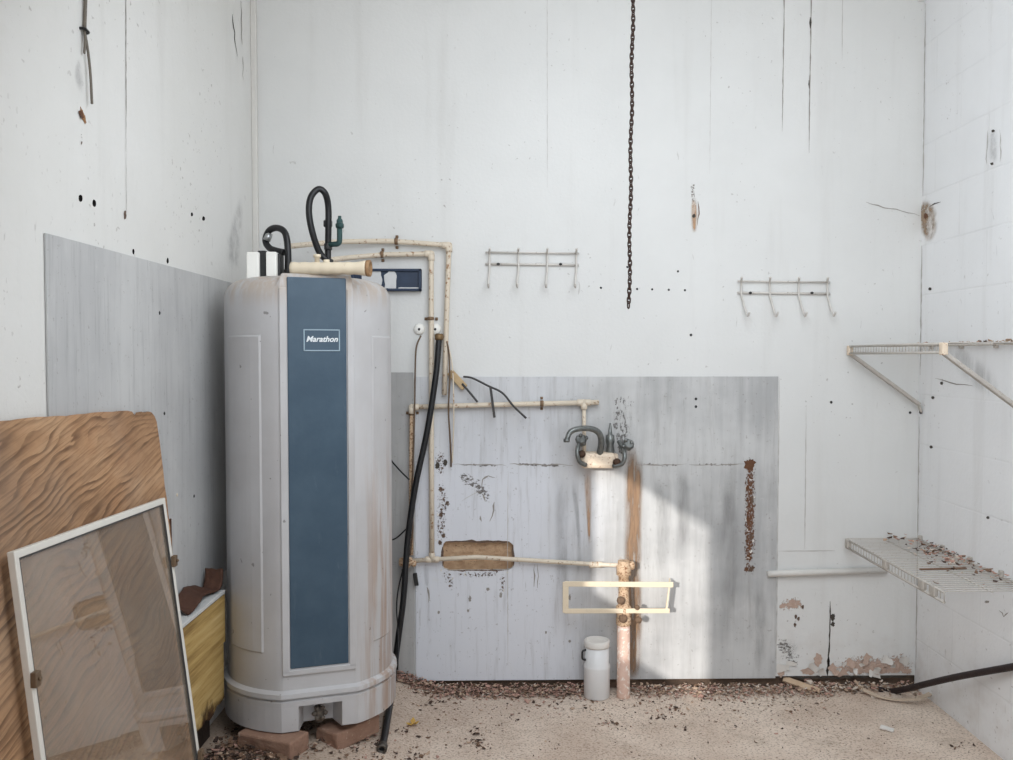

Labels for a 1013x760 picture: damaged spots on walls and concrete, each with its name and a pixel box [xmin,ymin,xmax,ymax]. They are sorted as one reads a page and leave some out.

corrosion [743,459,756,572]
peeling [779,598,804,627]
flaking render [776,640,912,679]